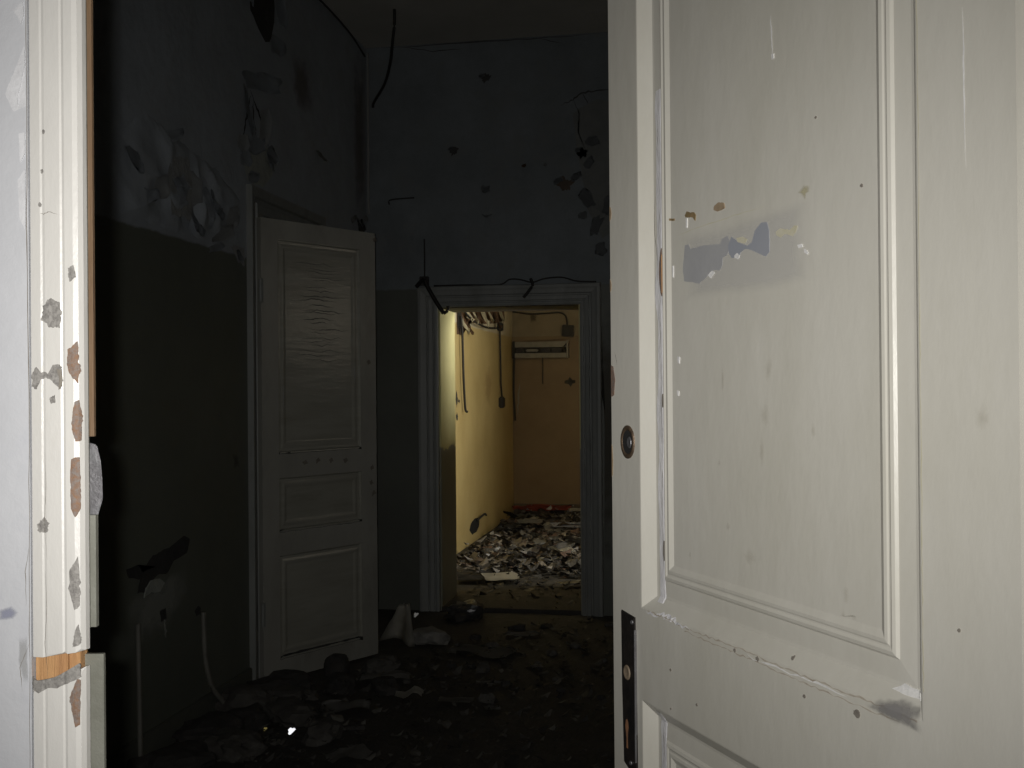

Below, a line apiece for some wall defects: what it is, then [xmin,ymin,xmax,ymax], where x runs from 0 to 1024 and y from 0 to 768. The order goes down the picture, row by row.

peeling [553,99,612,256]
peeling [683,222,770,284]
peeling [41,298,62,328]
peeling [31,341,81,404]
peeling [71,400,83,442]
peeling [70,457,81,517]
peeling [68,557,81,610]
peeling [69,679,81,727]